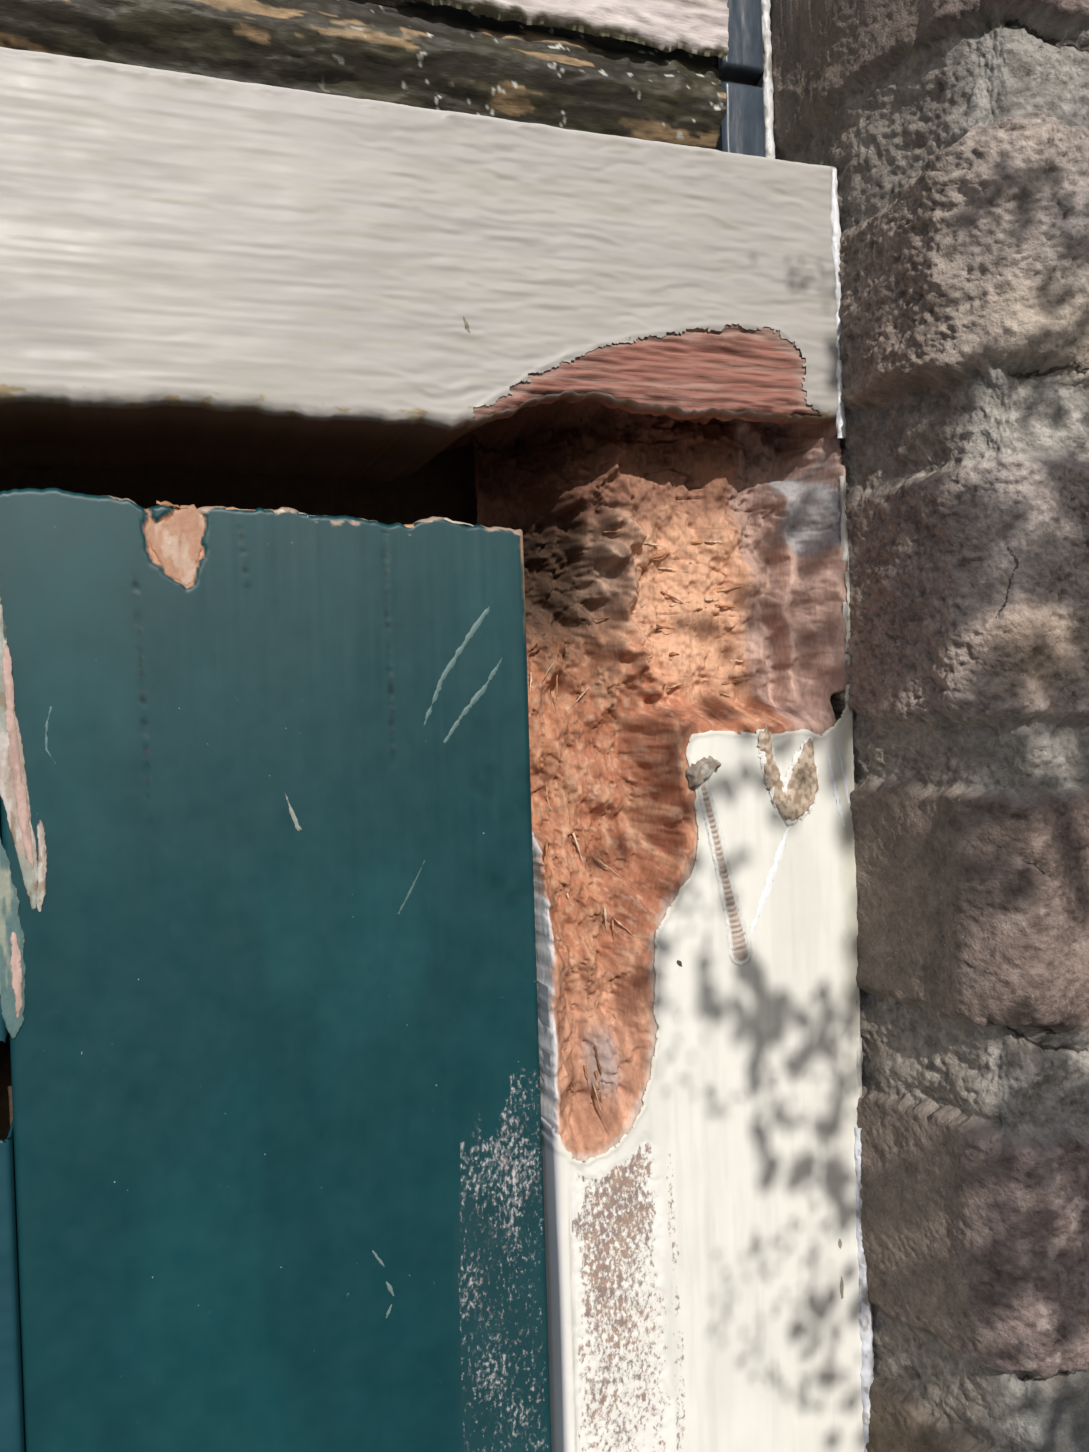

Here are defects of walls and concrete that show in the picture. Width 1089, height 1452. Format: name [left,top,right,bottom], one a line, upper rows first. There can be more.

crack [1008,361,1089,379]
spalling [145,501,205,587]
spalling [226,507,313,516]
peeling [0,598,47,1038]
spalling [437,324,849,1452]